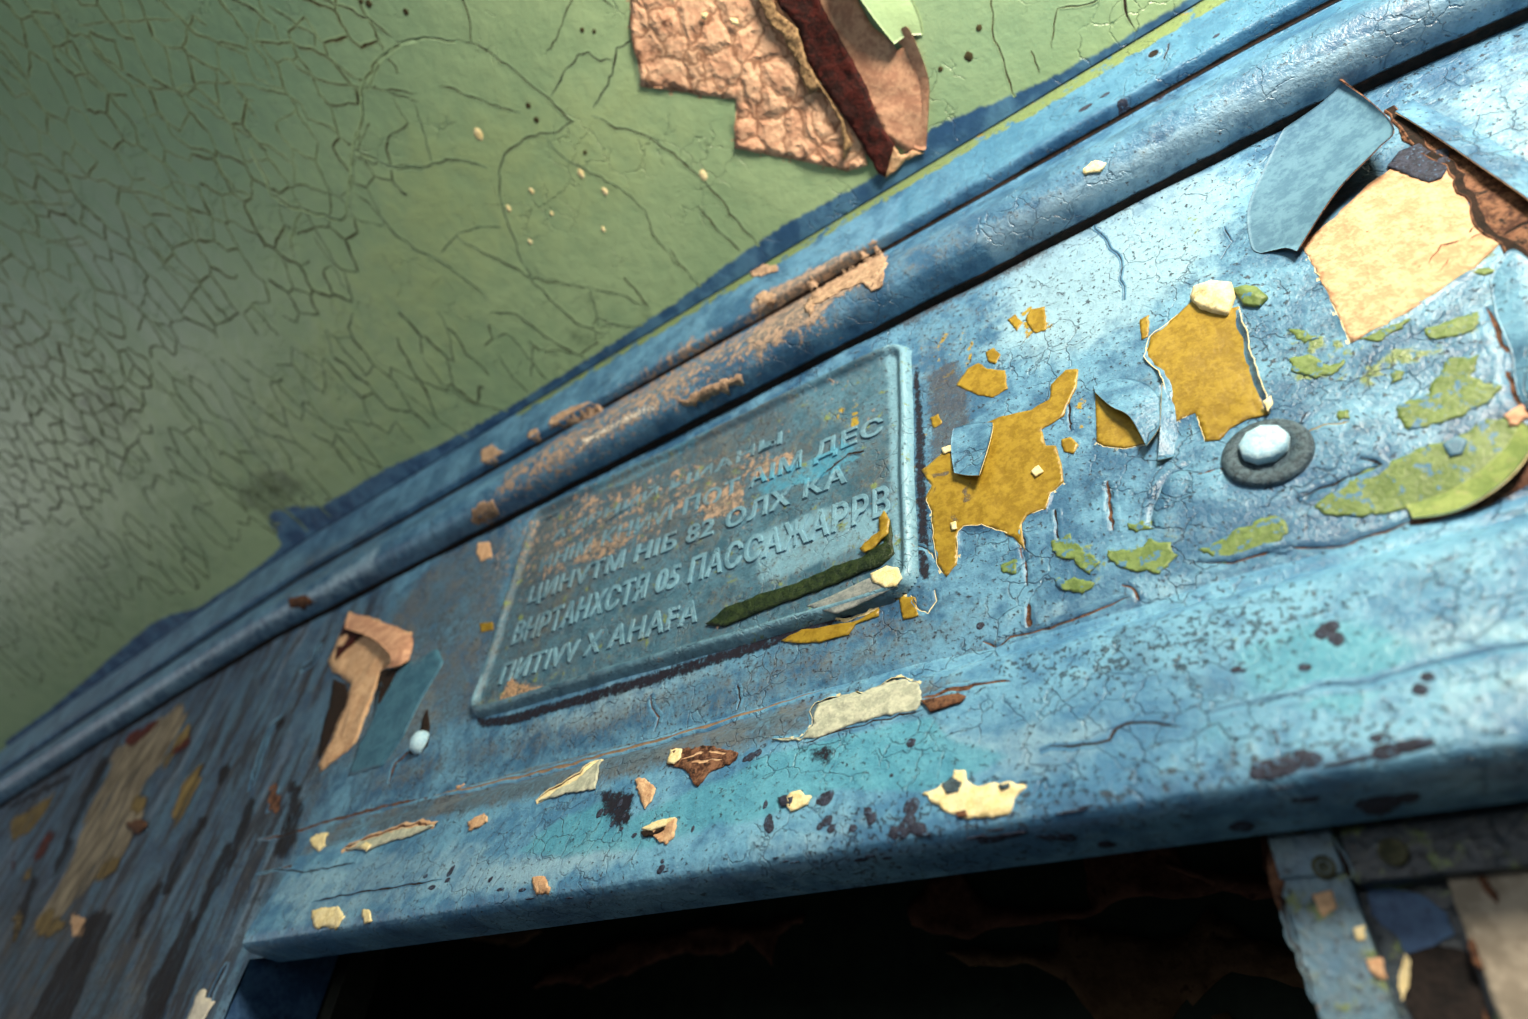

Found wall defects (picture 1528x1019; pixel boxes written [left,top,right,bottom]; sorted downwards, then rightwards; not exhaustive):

peeling [624,0,930,178]
crack [0,0,760,697]
peeling [1247,79,1528,526]
peeling [922,280,1273,579]
crack [1099,480,1123,532]
crack [979,508,1146,650]
peeling [318,611,444,777]
peeling [666,745,738,787]
peeling [771,673,1013,746]
peeling [922,770,1027,820]
crack [1038,718,1182,754]
spalling [1353,888,1492,1019]